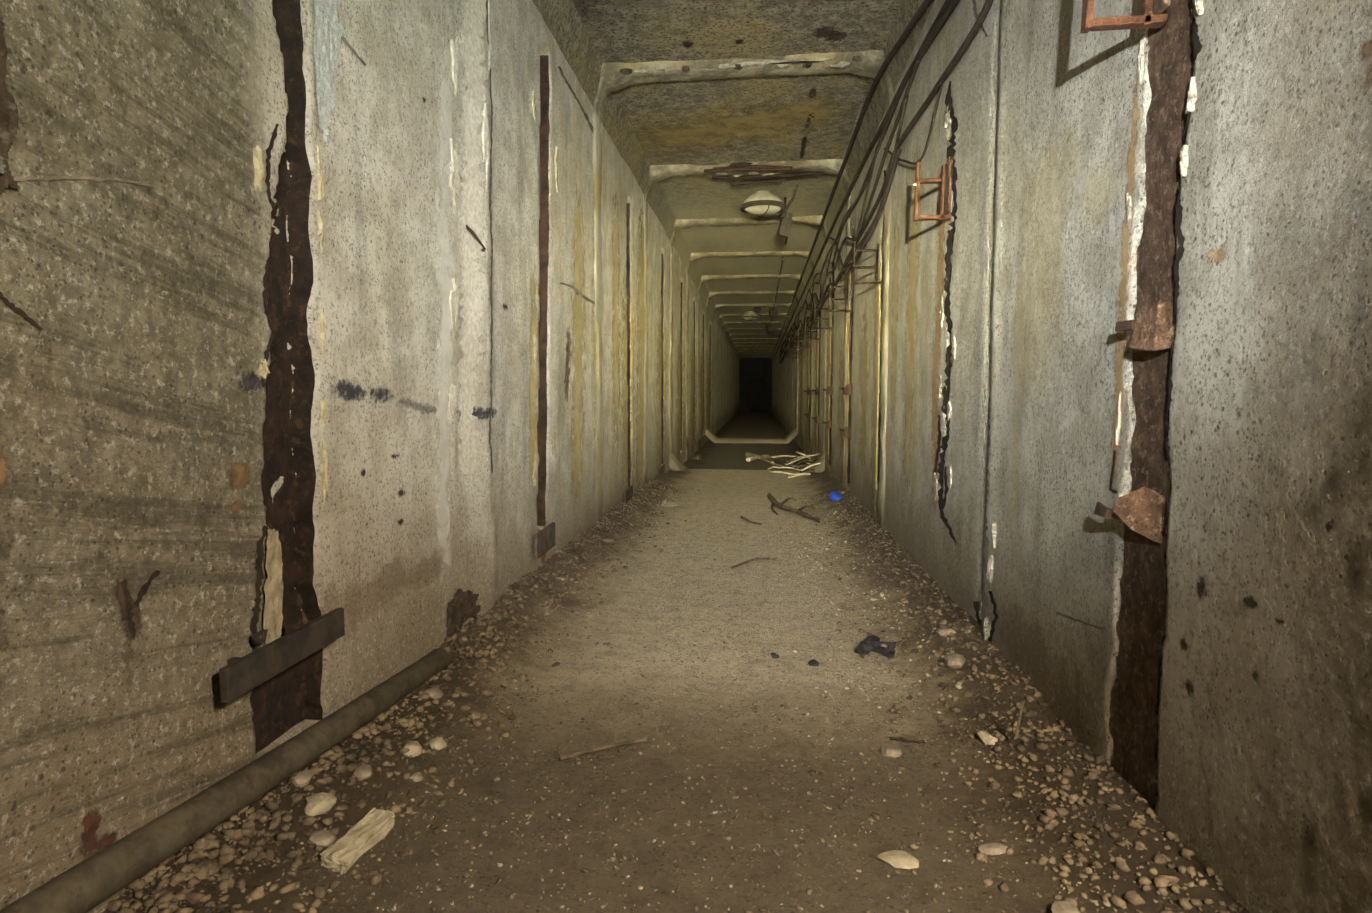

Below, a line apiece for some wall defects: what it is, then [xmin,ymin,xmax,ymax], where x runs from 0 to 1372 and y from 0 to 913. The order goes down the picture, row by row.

spalling [0,18,20,194]
spalling [250,0,345,645]
crack [932,81,958,544]
rust [1112,92,1139,480]
spalling [250,648,323,754]